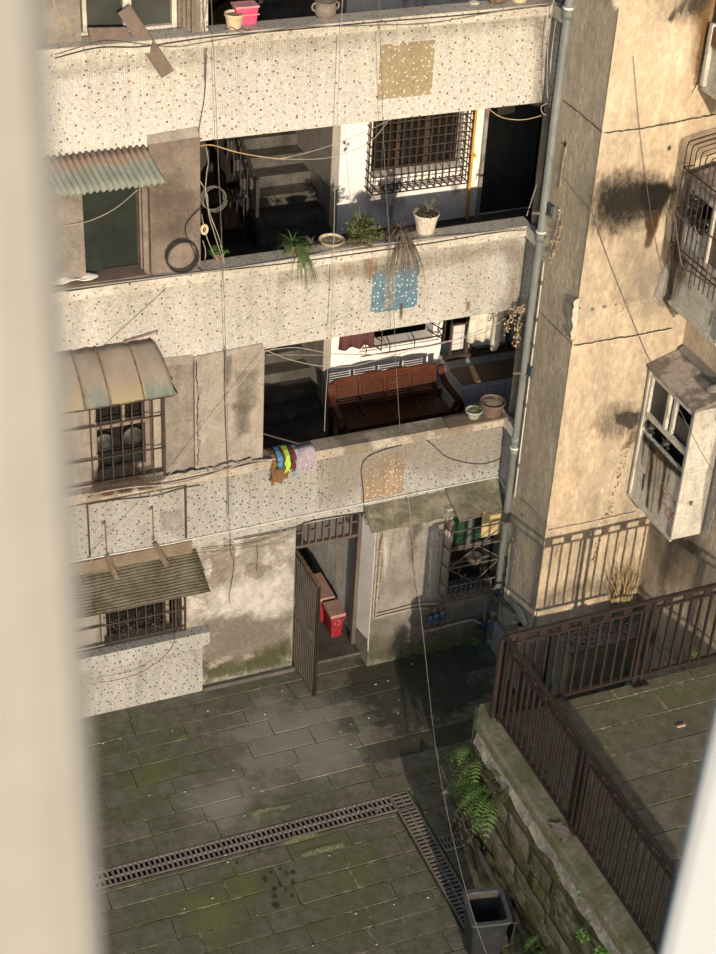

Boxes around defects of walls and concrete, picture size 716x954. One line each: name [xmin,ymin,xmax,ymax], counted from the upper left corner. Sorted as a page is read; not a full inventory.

crack [194,361,202,465]
rust [641,434,681,514]
leakage [203,574,292,684]